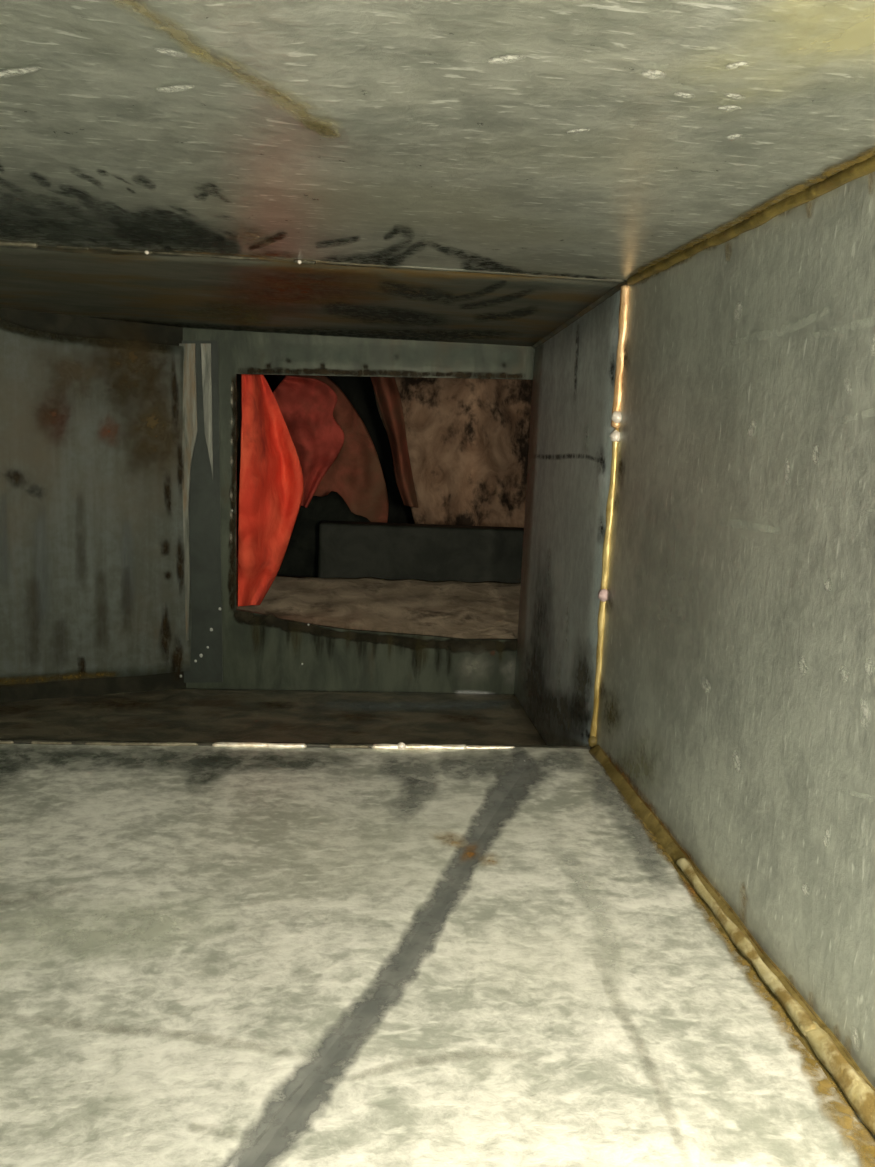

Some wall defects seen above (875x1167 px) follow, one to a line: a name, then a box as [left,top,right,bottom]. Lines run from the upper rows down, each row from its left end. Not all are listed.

damp [0,166,231,249]
corrosion [165,447,183,510]
corrosion [163,542,184,586]
corrosion [161,614,182,677]